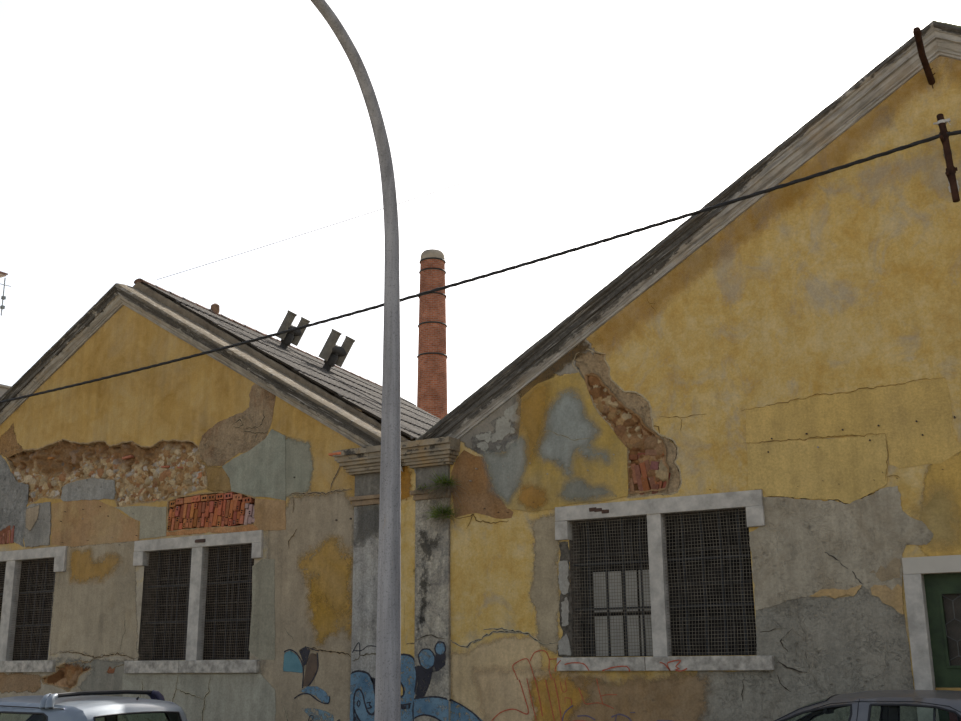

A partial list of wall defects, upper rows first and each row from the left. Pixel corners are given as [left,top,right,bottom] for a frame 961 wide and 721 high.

crack [742,378,938,411]
peeling [471,402,521,454]
flaking render [572,349,682,499]
flaking render [0,384,276,536]
damp [401,466,412,500]
crack [759,433,900,504]
damp [354,504,379,543]
damp [299,537,352,644]
damp [414,531,440,630]
flaking render [810,558,904,614]
crack [285,629,376,661]
crack [407,627,558,648]